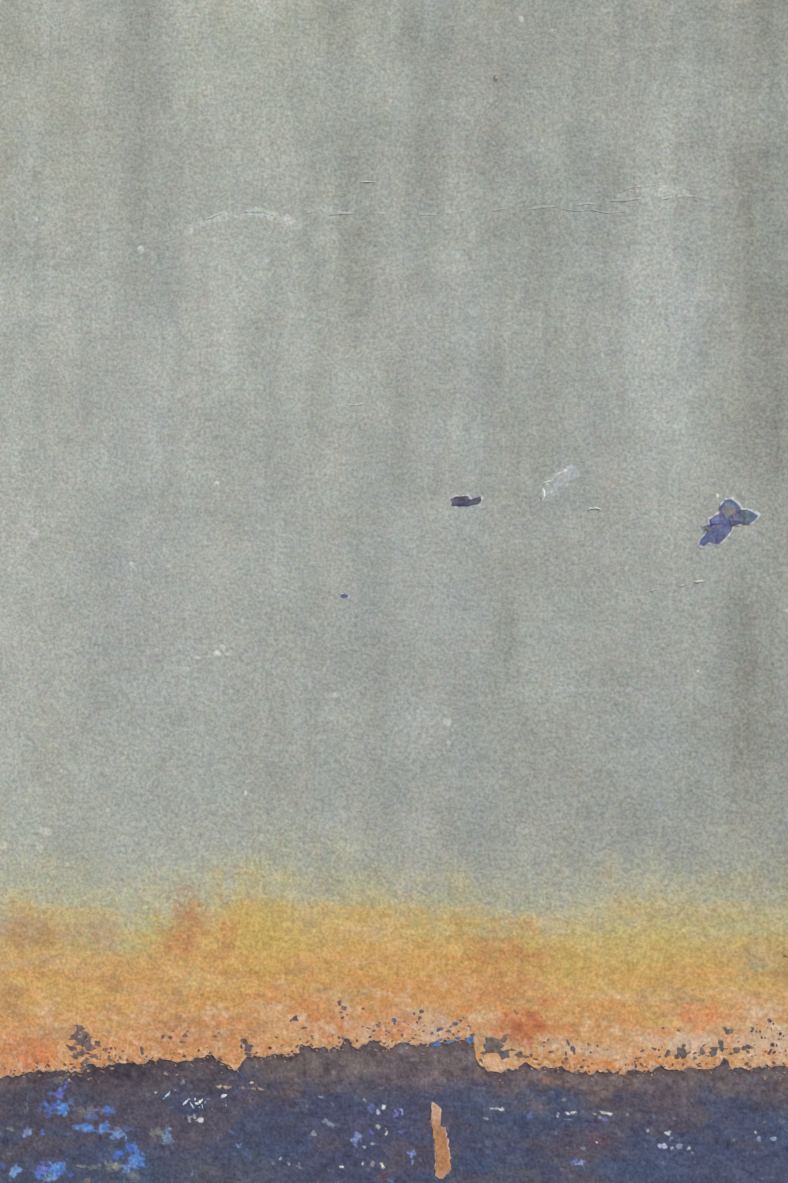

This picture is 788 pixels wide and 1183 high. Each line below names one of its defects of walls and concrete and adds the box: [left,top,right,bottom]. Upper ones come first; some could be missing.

peeling [697,493,761,548]
corrosion [0,873,788,1077]